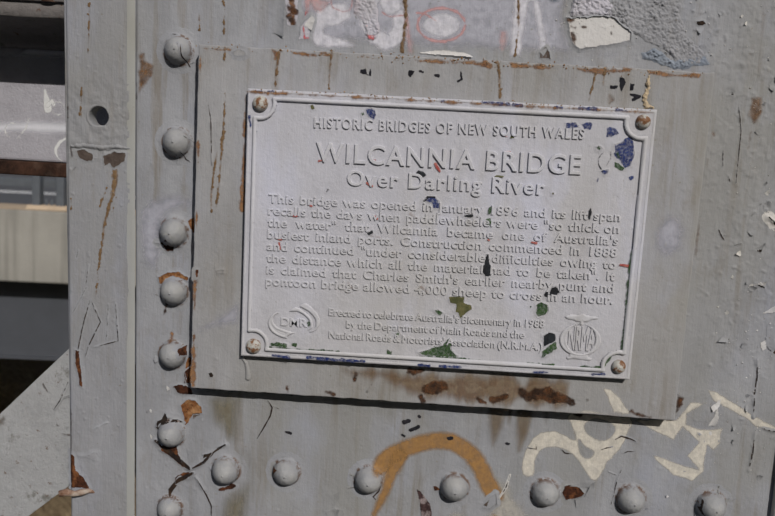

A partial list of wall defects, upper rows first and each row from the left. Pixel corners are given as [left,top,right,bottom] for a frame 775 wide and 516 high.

corrosion [250,50,287,95]
peeling [272,0,317,44]
corrosion [400,0,408,53]
corrosion [457,60,505,106]
corrosion [511,0,550,69]
peeling [534,44,555,64]
corrosion [579,67,630,95]
spalling [563,0,711,70]
corrosion [210,93,226,213]
corrosion [97,169,118,273]
peeling [151,340,217,488]
peeling [67,448,92,491]